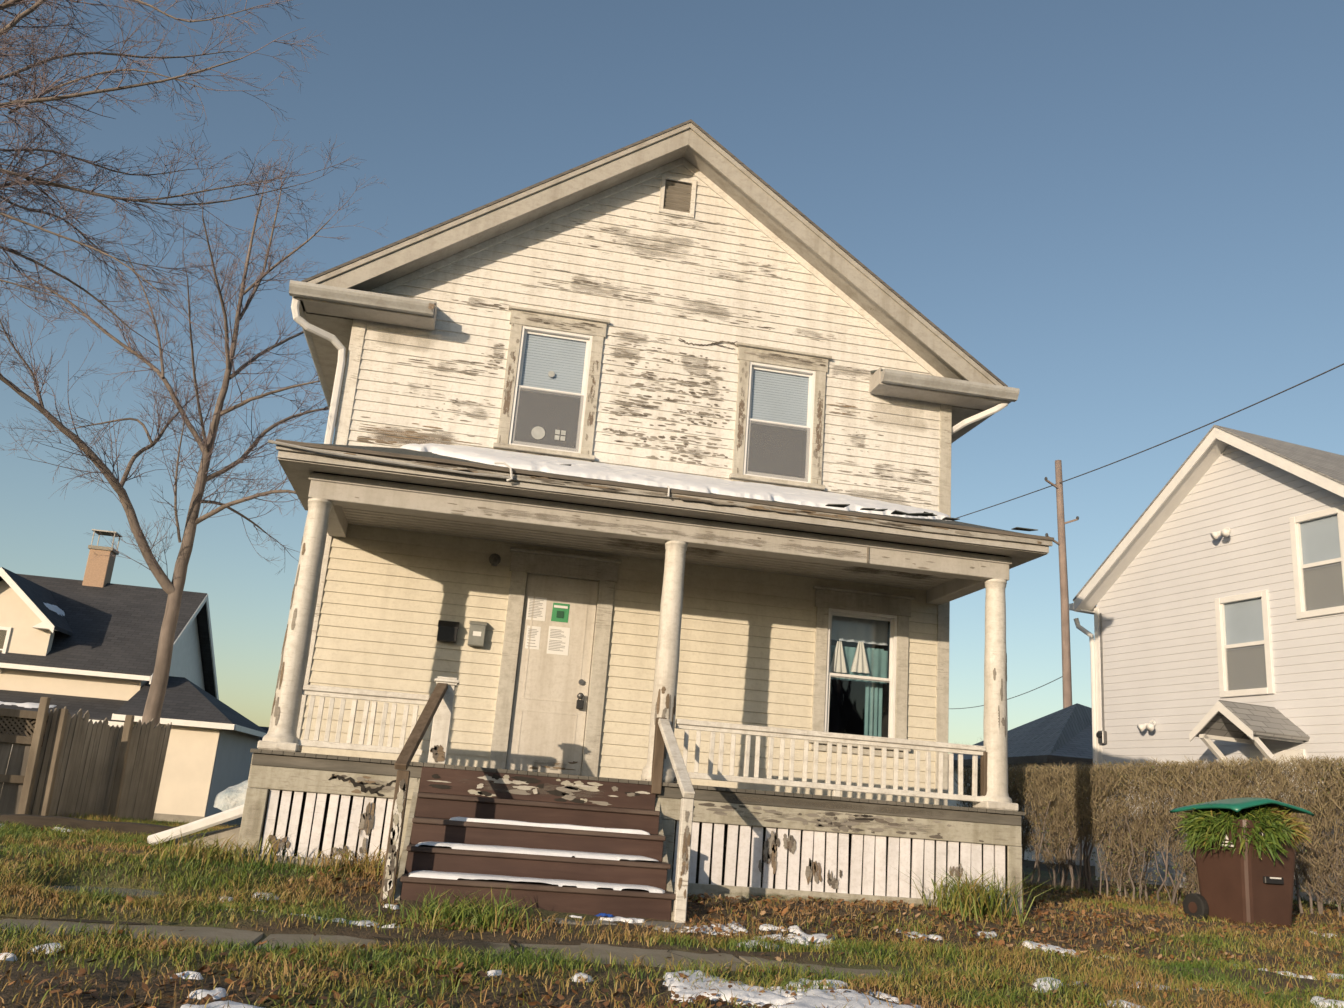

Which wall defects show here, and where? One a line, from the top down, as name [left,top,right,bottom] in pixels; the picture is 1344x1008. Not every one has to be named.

peeling [546,213,791,282]
peeling [522,269,779,330]
peeling [344,297,871,482]
peeling [810,390,931,507]
crack [328,774,396,796]
peeling [428,745,452,789]
peeling [468,761,650,806]
peeling [331,775,406,900]
peeling [678,803,952,899]